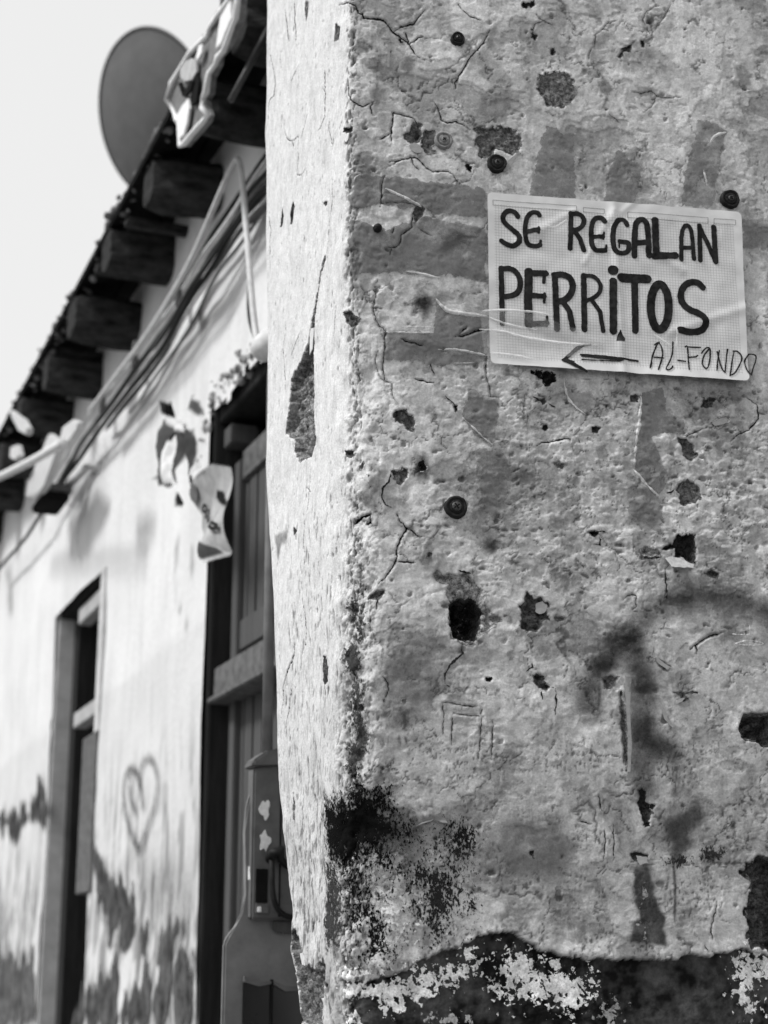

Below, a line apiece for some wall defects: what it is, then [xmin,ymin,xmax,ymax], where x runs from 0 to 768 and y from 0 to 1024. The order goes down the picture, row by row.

crack [268,2,489,250]
flaking render [465,124,522,172]
flaking render [536,71,578,108]
flaking render [286,256,326,463]
crack [379,515,419,583]
flaking render [640,533,719,597]
spalling [434,570,502,687]
spalling [738,713,768,747]
peeling [291,588,632,1024]
flaking render [720,856,768,1024]